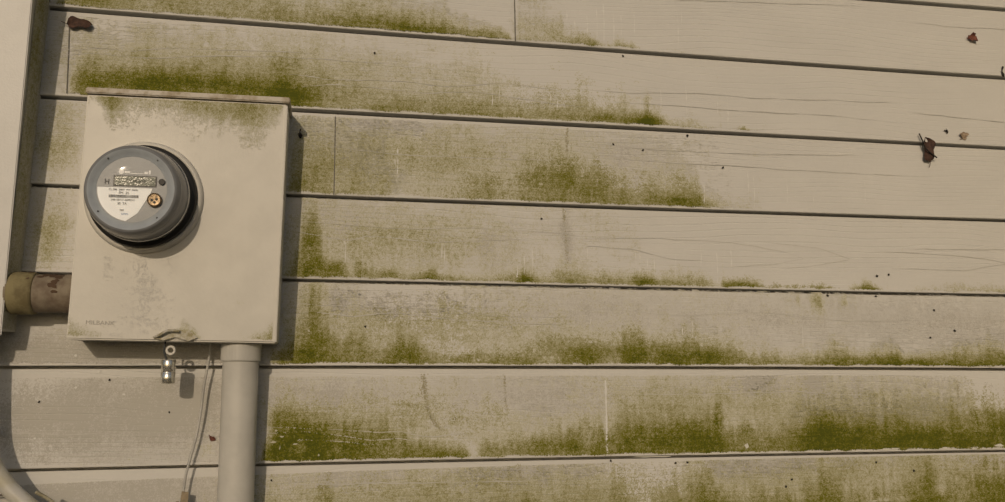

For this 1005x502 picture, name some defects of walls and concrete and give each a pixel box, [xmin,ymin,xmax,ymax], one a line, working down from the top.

damp [304,117,733,208]
damp [0,313,223,365]
damp [256,171,1005,455]
damp [20,476,218,502]
damp [254,454,1005,502]